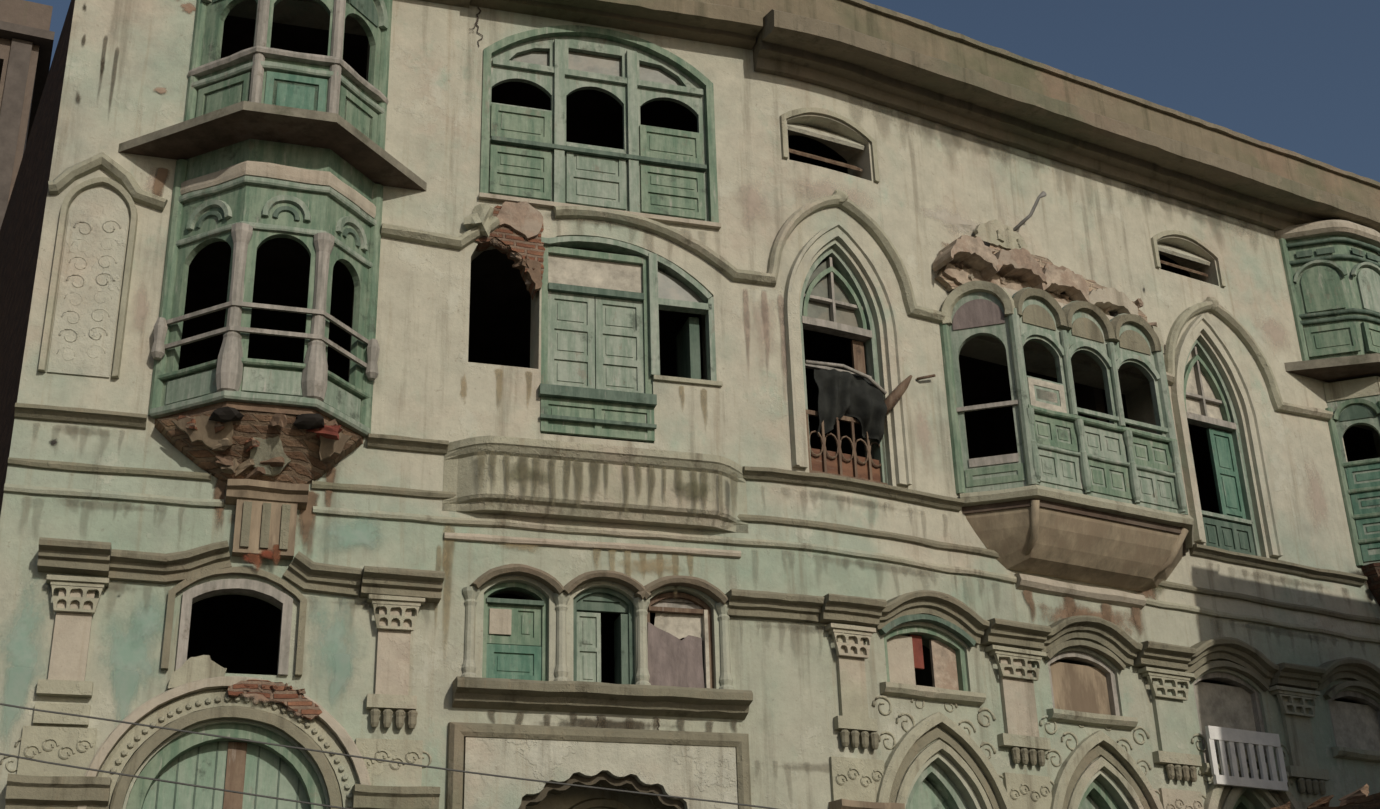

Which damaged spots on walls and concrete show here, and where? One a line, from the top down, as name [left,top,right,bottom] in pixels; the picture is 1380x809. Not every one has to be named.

crack [469,7,483,47]
peeling [464,203,531,291]
spalling [932,219,1157,327]
leakage [478,451,737,516]
spalling [227,679,322,721]